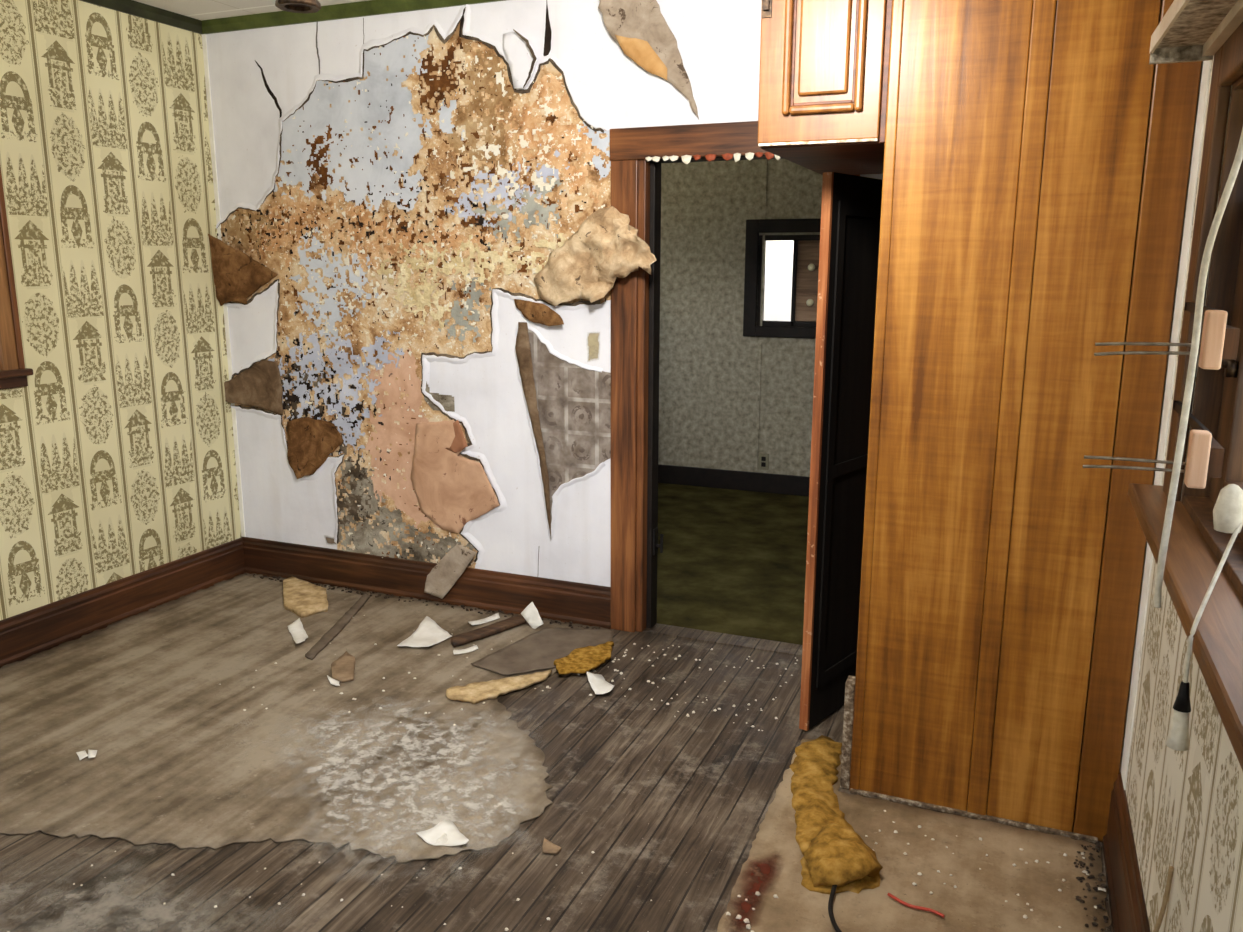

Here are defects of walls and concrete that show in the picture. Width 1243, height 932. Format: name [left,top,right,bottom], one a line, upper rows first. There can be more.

crack [255,61,282,118]
peeling [598,0,699,119]
peeling [208,4,657,569]